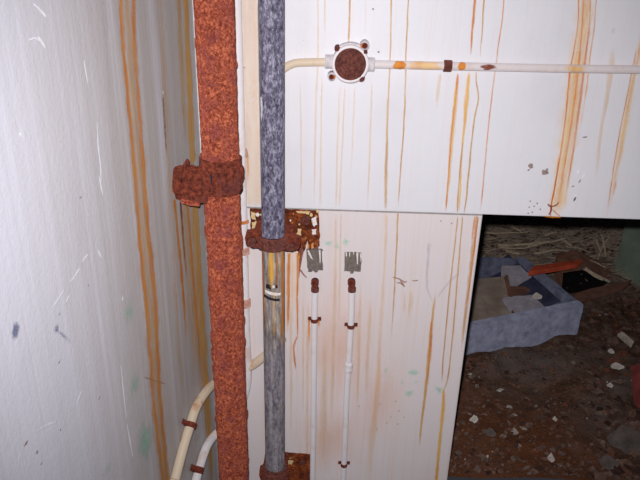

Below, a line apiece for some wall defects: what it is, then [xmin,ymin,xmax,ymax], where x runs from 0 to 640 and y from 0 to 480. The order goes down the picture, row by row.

rust [119,0,171,480]
rust [262,243,319,454]
rust [419,295,436,447]
rust [435,62,479,480]
rust [470,0,485,55]
rust [481,72,495,205]
rust [545,0,597,218]
rust [607,74,636,211]